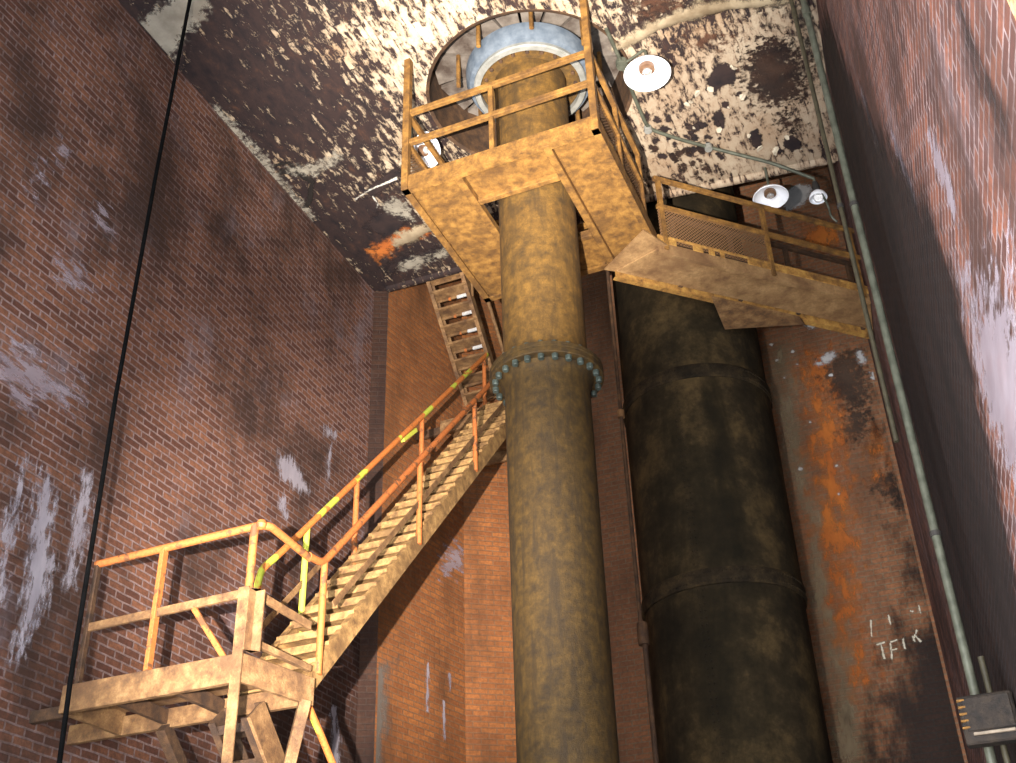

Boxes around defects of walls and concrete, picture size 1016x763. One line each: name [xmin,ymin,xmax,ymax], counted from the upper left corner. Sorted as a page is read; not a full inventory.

peeling [626,0,725,27]
peeling [649,30,814,184]
peeling [358,166,401,201]
peeling [362,208,405,241]
corrosion [367,228,409,258]
peeling [382,246,447,276]
leakage [820,0,1016,708]
leakage [279,455,307,492]
leakage [64,469,91,585]
leakage [9,467,56,662]
leakage [811,538,964,763]
leakage [993,743,1016,763]